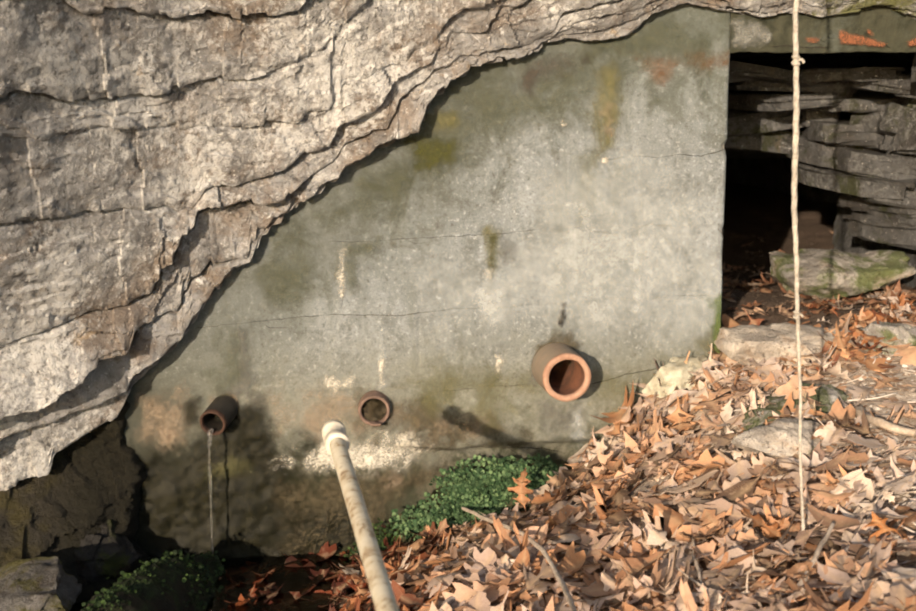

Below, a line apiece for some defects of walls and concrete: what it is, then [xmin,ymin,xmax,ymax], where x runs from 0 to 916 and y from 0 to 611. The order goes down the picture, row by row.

damp [149,399,198,440]
damp [134,407,356,582]
damp [348,430,435,523]